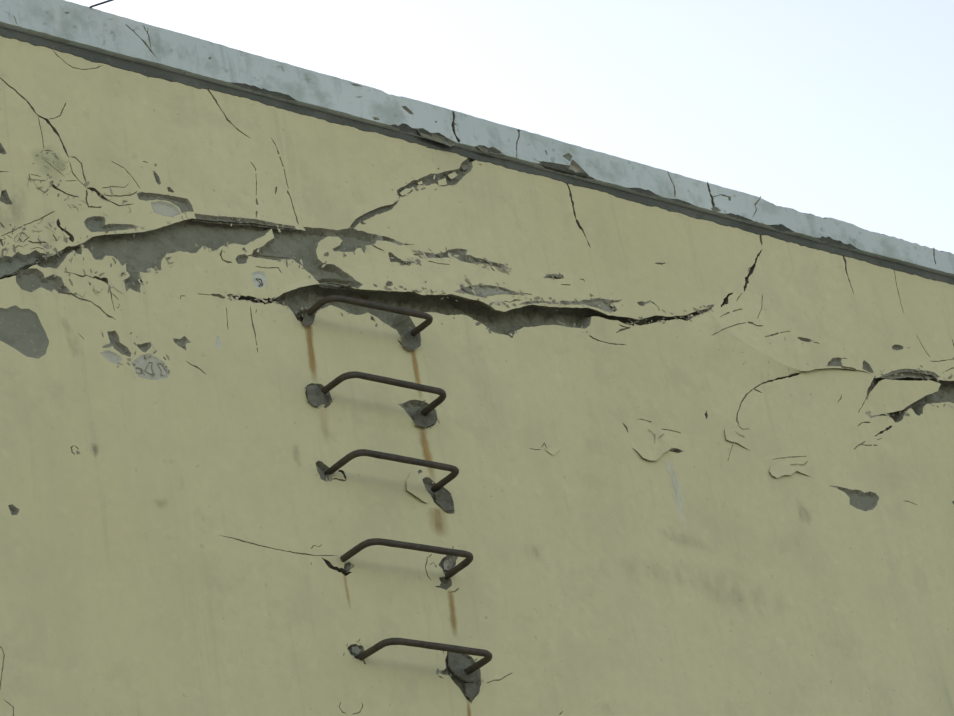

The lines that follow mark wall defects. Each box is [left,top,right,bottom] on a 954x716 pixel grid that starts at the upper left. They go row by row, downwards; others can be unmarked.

crack [125,24,157,58]
spalling [629,188,695,206]
crack [0,78,790,352]
flaking render [384,248,512,274]
flaking render [0,216,170,380]
flaking render [173,336,191,350]
corrosion [307,325,315,371]
spalling [398,327,421,353]
crack [736,373,800,425]
flaking render [831,485,879,511]
crack [220,535,334,556]
spalling [436,651,512,704]